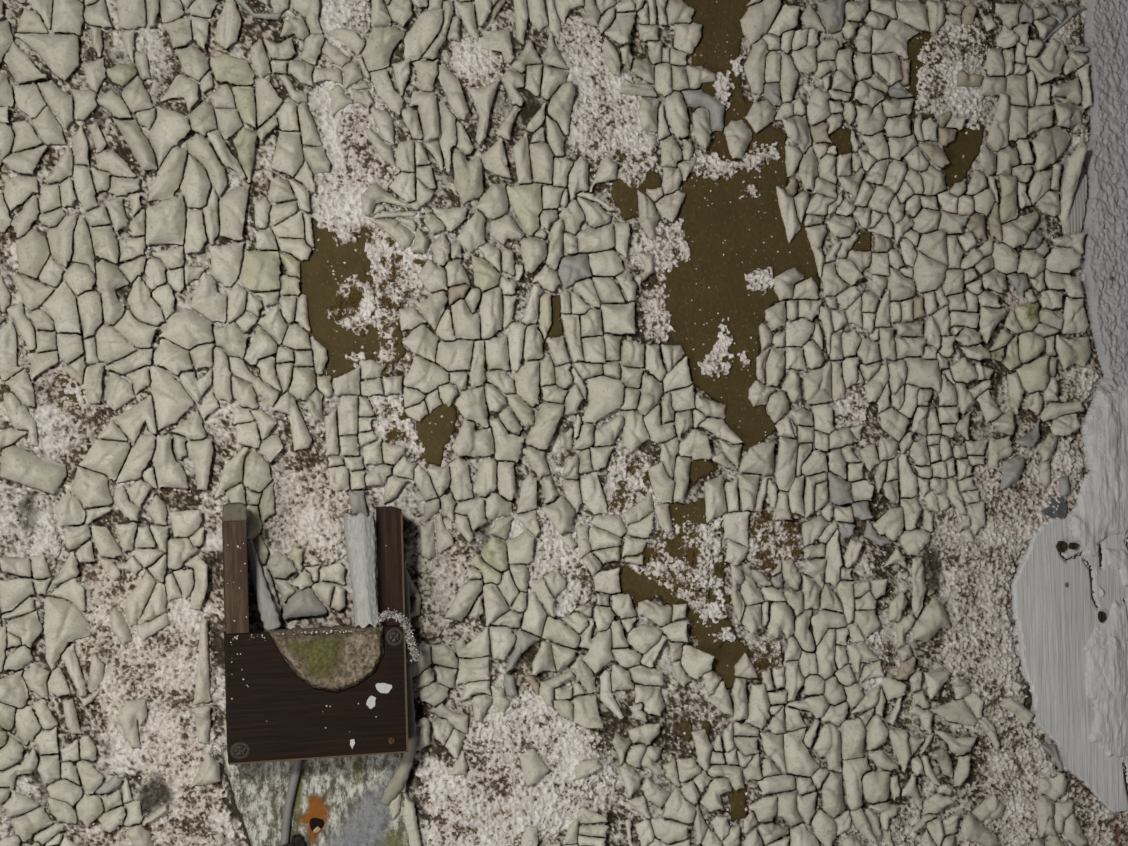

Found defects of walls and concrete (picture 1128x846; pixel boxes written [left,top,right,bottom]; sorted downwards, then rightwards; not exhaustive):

flaking render [0,0,369,846]
peeling [239,0,1128,846]
crack [1060,538,1128,608]
crack [219,762,252,846]
rust [299,794,329,844]